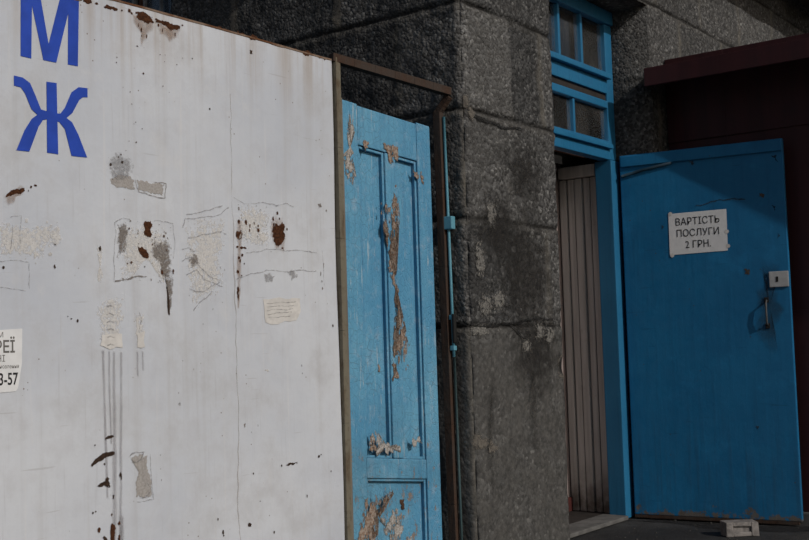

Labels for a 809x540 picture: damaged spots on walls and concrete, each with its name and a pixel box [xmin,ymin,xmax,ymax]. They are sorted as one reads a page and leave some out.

rust [77,0,183,38]
peeling [344,115,356,184]
rust [272,212,288,249]
peeling [381,185,410,381]
damp [472,197,555,381]
peeling [369,432,401,456]
rust [98,514,121,540]
peeling [358,490,412,540]